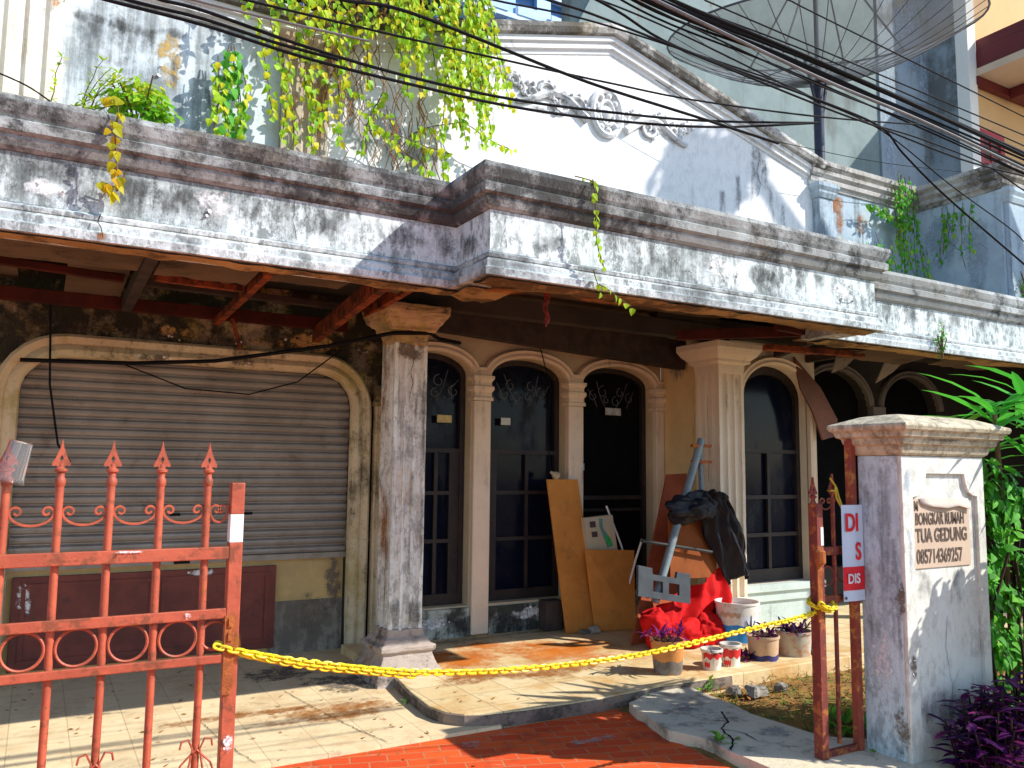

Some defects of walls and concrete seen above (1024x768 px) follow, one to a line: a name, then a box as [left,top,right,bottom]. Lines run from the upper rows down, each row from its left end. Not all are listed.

damp [335,87,438,177]
corrosion [833,197,843,233]
damp [392,604,420,625]
corrosion [433,640,605,684]
crack [720,711,758,750]